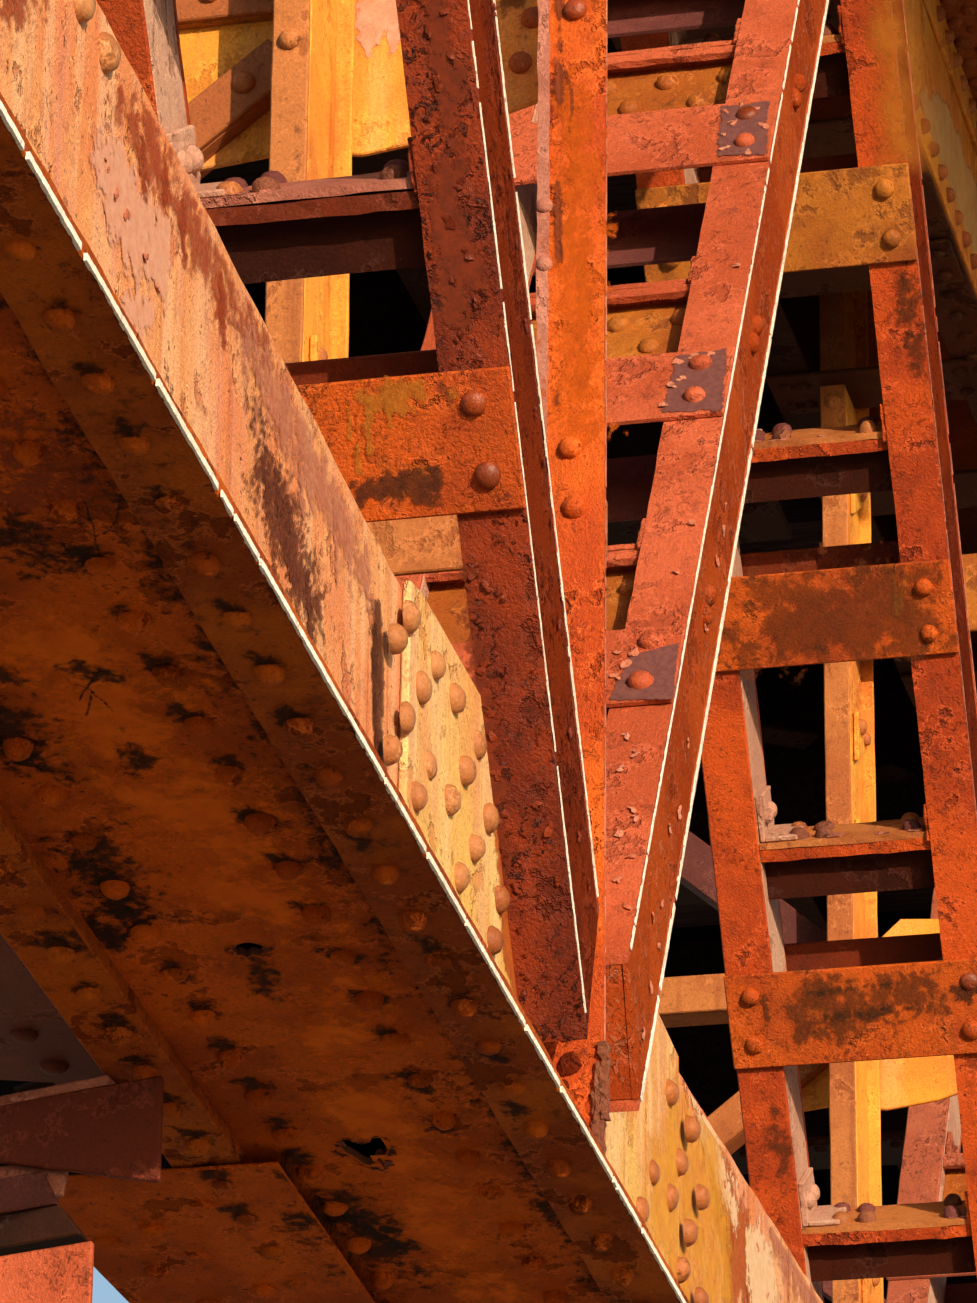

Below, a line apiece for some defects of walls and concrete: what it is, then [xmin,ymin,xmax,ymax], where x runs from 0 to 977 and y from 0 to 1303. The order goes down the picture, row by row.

rust [0,0,50,29]
rust [106,74,332,658]
rust [348,465,445,509]
rust [0,598,542,1303]
rust [949,983,977,1006]
rust [761,1107,794,1177]
rust [705,1139,752,1303]
rust [769,1223,820,1303]